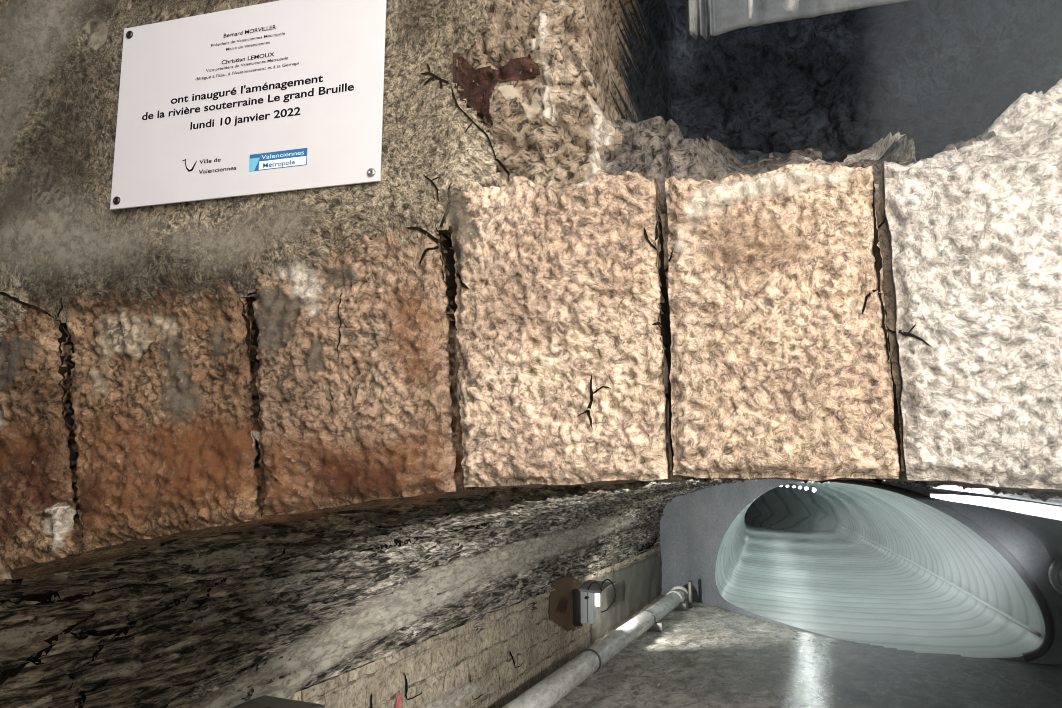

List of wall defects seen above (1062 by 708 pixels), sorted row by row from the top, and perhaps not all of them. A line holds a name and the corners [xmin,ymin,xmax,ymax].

crack [421,64,510,181]
crack [406,175,469,331]
crack [577,375,611,429]